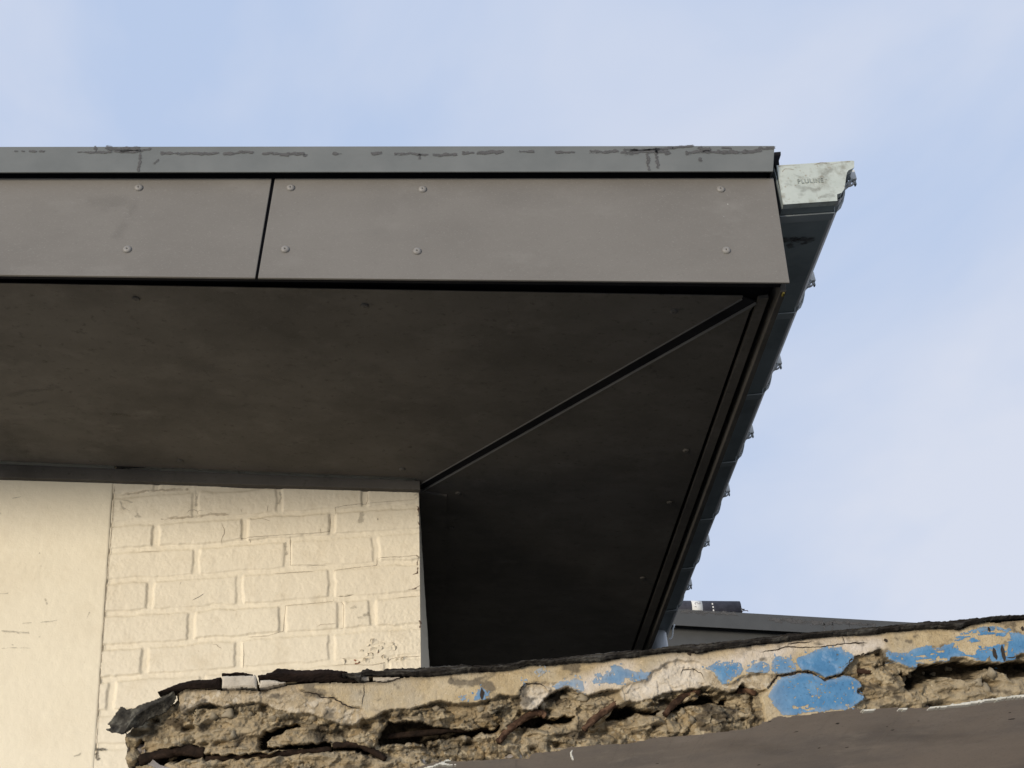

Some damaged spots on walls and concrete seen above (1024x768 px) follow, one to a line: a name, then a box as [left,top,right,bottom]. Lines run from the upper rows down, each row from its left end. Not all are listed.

spalling [125,626,1024,768]
crack [764,637,874,687]